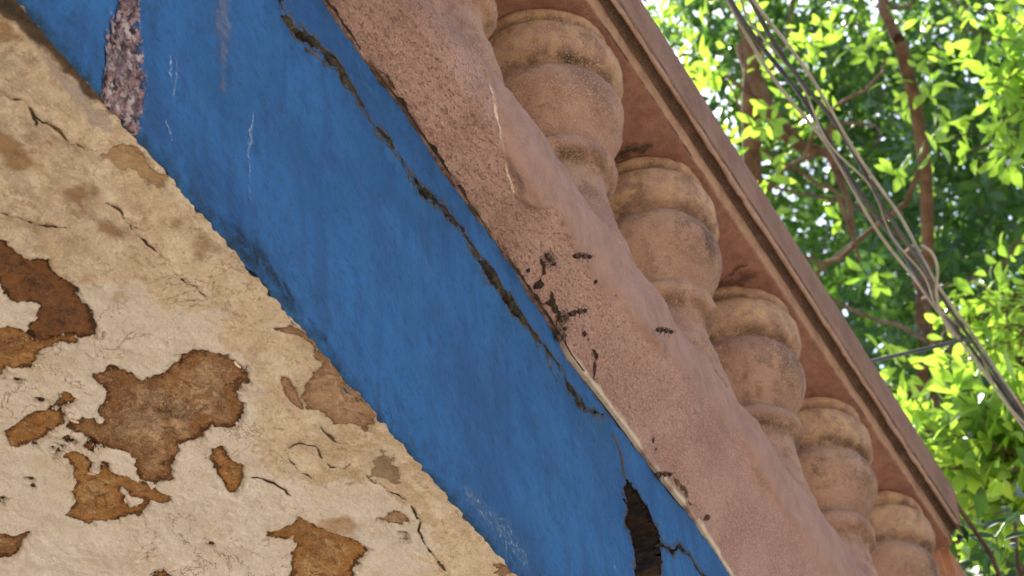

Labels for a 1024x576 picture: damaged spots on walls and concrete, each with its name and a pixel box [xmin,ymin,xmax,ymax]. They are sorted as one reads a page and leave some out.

peeling [0,0,169,188]
crack [278,0,605,427]
spalling [0,326,78,380]
spalling [4,349,250,524]
spalling [274,325,376,432]
spalling [266,517,368,576]
hole [614,437,707,576]